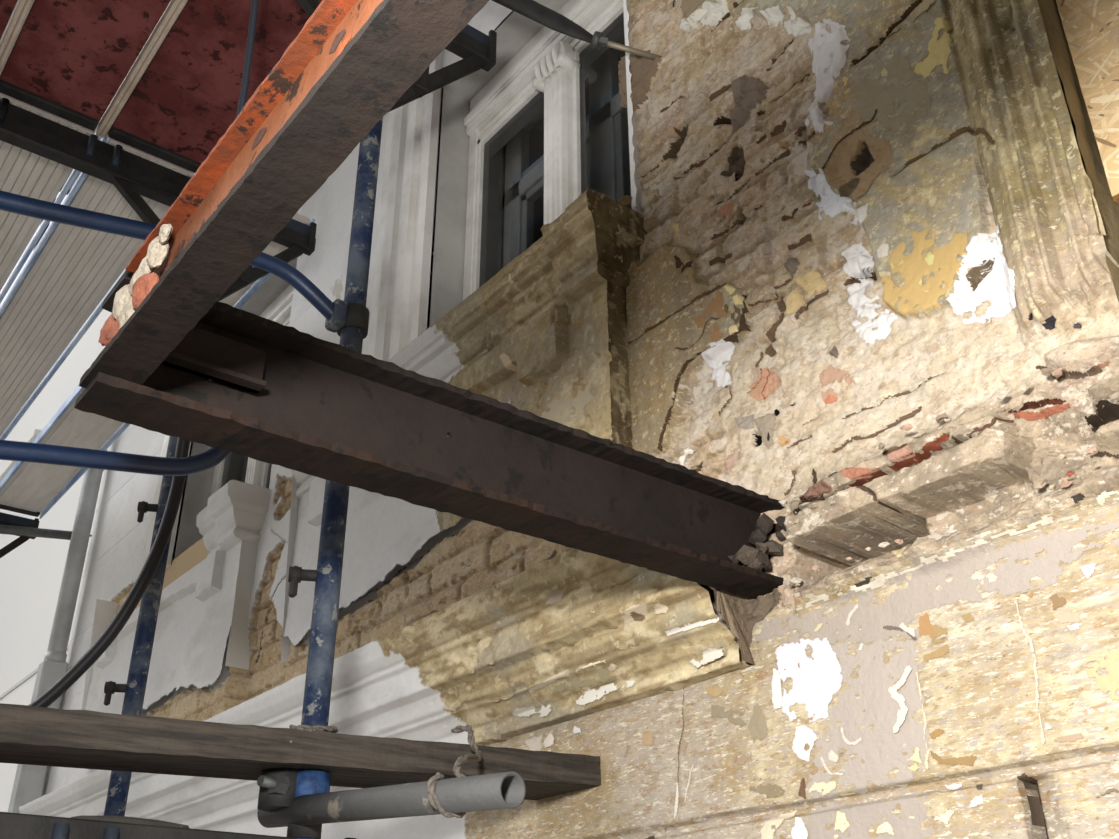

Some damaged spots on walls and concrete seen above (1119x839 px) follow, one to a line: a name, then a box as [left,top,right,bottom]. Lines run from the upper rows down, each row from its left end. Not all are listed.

crack [711,0,744,32]
crack [852,0,934,66]
spalling [825,132,893,201]
crack [894,126,995,176]
crack [628,40,878,451]
spalling [965,257,995,291]
spalling [1028,313,1056,330]
crack [767,373,1014,536]
peeling [665,617,719,636]
peeling [576,680,636,706]
peeling [690,648,724,668]
peeling [754,515,1119,839]